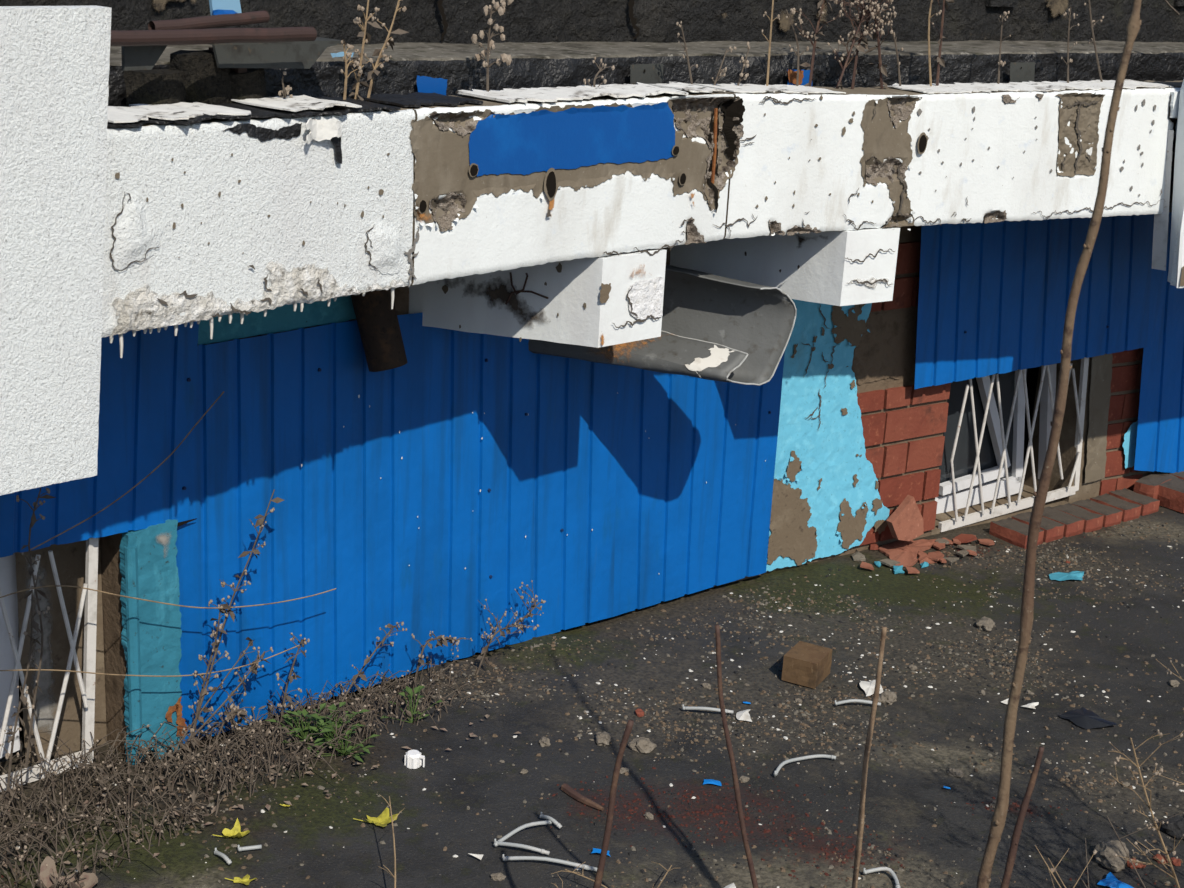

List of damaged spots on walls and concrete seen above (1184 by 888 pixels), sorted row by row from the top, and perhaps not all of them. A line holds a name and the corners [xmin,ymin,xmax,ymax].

peeling [224,123,302,142]
peeling [410,96,745,232]
peeling [842,95,930,230]
peeling [1036,93,1106,177]
spalling [685,217,706,245]
crack [844,165,970,288]
spalling [109,252,405,358]
peeling [791,304,870,358]
peeling [767,451,822,566]
peeling [836,481,887,549]